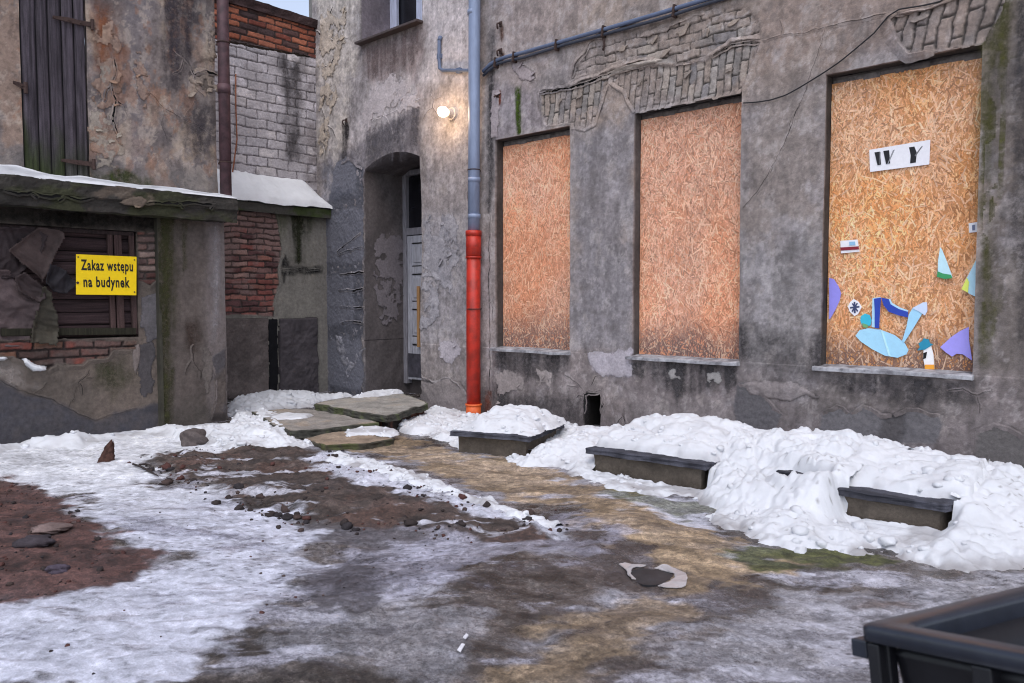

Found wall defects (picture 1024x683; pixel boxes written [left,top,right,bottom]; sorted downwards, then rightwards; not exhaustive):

peeling [87,8,151,169]
damp [282,59,300,157]
flaking render [317,7,404,396]
peeling [490,89,501,138]
flaking render [511,2,764,132]
crack [742,3,927,209]
flaking render [879,0,1006,64]
damp [979,91,1018,221]
damp [982,1,1024,86]
peeling [587,347,634,378]